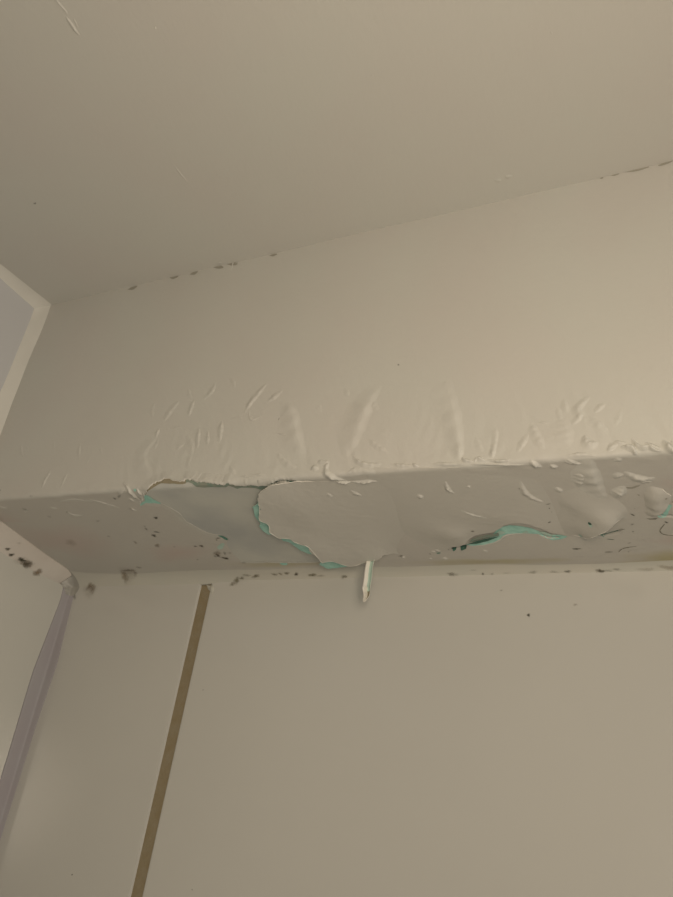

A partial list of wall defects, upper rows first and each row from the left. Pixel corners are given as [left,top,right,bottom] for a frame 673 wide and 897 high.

leakage [0,508,323,581]
peeling [131,470,320,565]
leakage [357,522,673,572]
peeling [554,458,673,539]